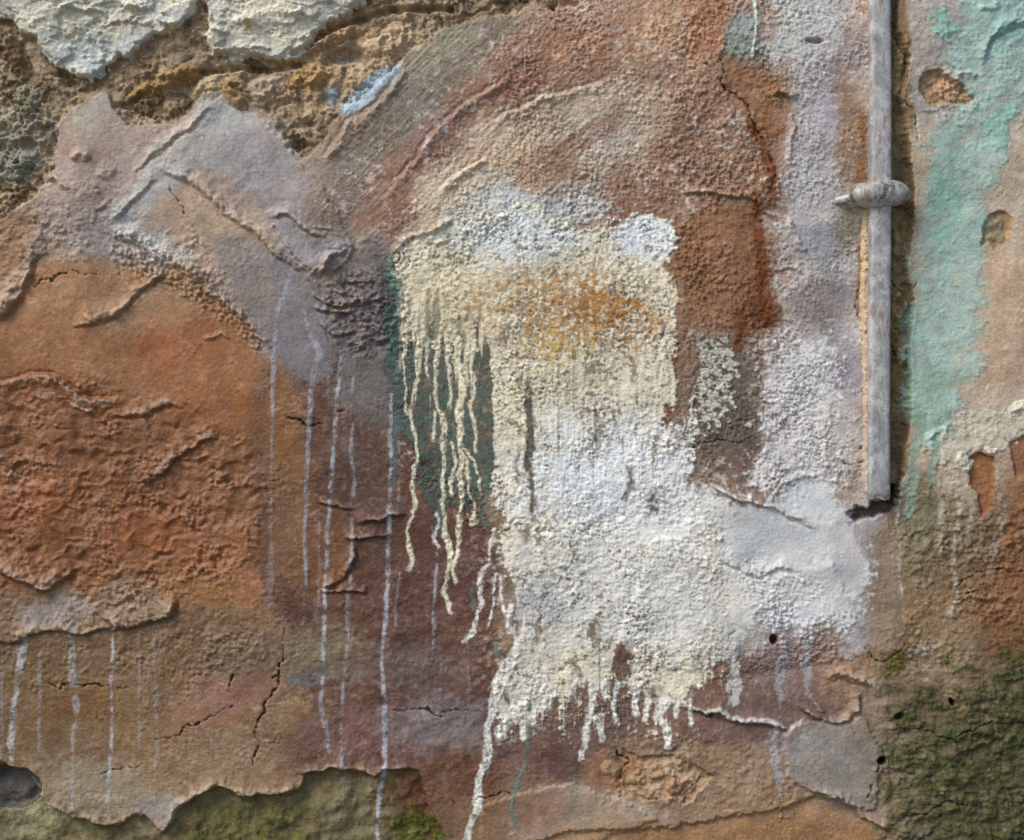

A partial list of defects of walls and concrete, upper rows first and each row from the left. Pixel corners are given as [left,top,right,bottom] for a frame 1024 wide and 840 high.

spalling [0,0,560,219]
rust [662,120,781,387]
peeling [890,0,1024,516]
leakage [7,689,19,761]
leakage [16,598,84,671]
spalling [0,761,447,840]
leakage [321,447,335,663]
leakage [375,570,391,840]
leakage [684,633,805,730]
leakage [712,471,821,525]